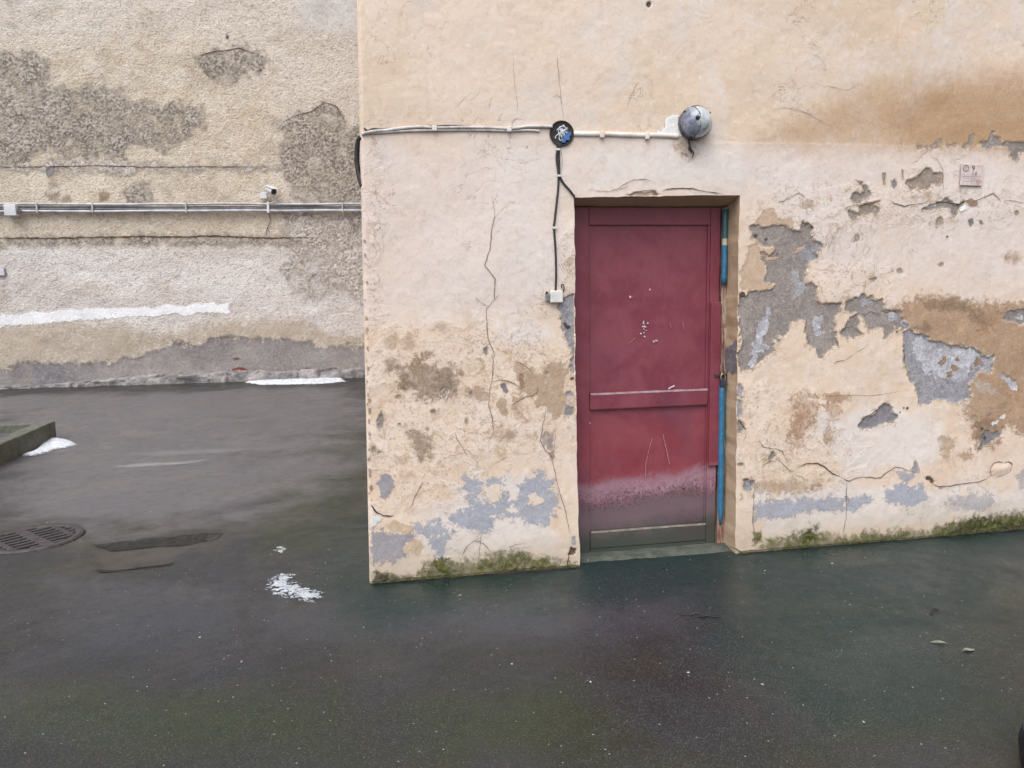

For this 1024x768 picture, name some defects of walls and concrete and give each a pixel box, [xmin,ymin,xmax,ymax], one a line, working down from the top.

spalling [917,130,1024,163]
crack [591,179,721,194]
spalling [846,179,881,241]
spalling [882,166,983,237]
crack [455,203,519,457]
spalling [557,293,576,417]
spalling [725,197,1018,440]
spalling [976,413,1005,452]
crack [463,411,575,575]
spalling [737,462,755,500]
crack [730,442,990,554]
peeling [386,517,458,560]